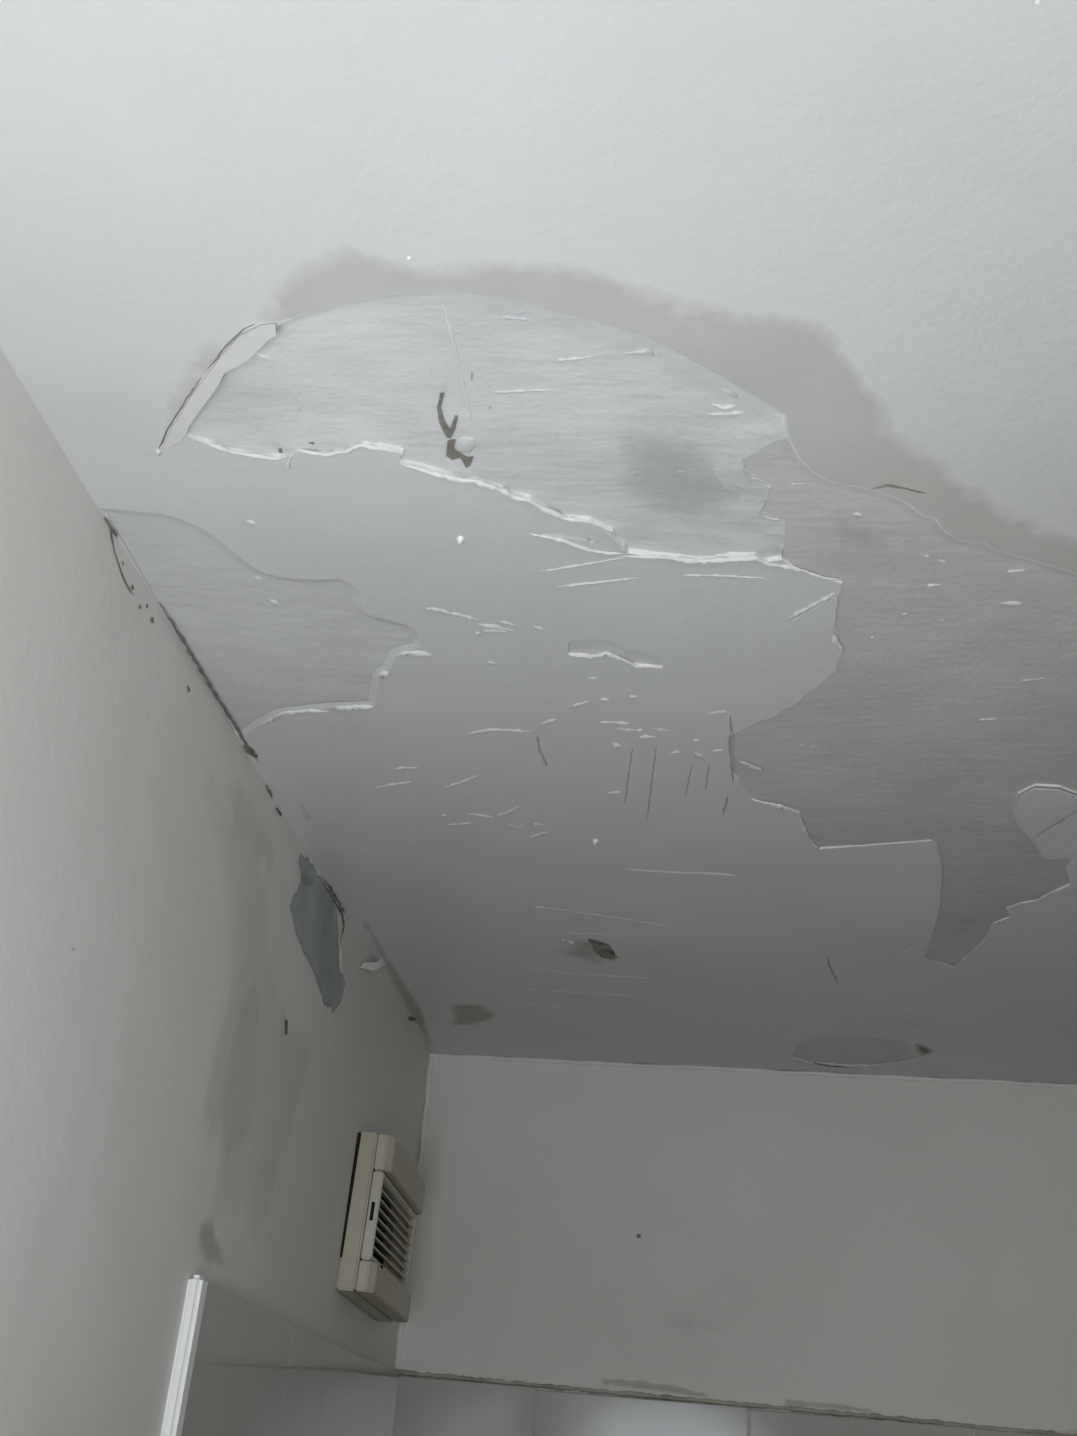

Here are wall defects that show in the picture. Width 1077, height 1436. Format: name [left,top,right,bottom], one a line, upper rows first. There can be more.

peeling [98,508,432,736]
peeling [164,292,1077,969]
peeling [290,855,386,1012]